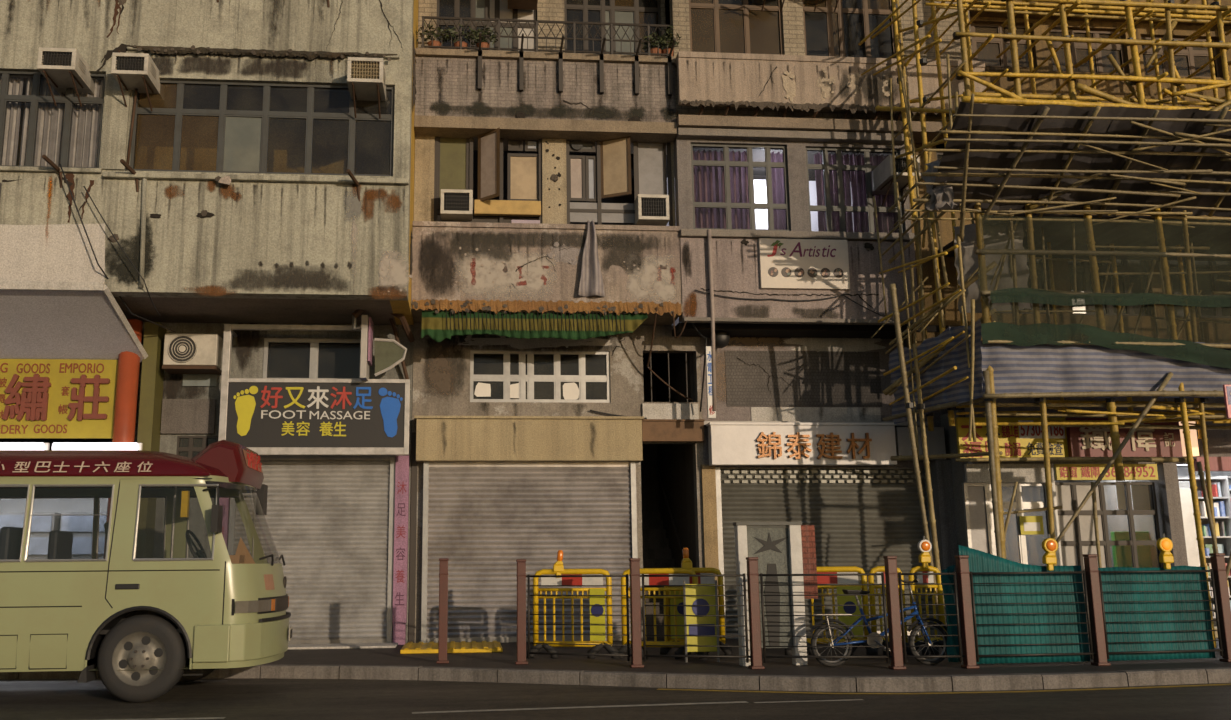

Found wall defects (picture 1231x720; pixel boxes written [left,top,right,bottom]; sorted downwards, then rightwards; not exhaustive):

leakage [156,184,201,206]
rust [208,181,241,201]
rust [352,184,386,219]
leakage [379,188,405,210]
leakage [105,218,152,284]
leakage [231,266,347,291]